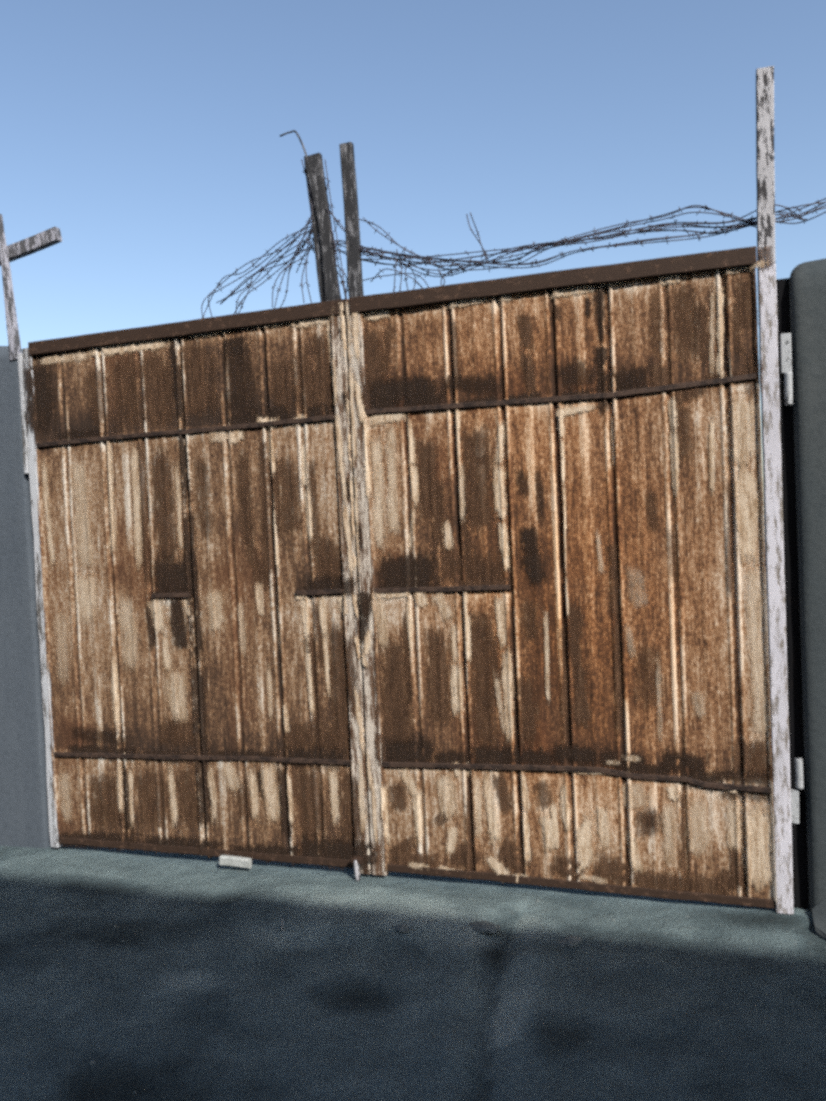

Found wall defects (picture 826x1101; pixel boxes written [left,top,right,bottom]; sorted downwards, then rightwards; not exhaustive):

corrosion [758,246,773,270]
corrosion [359,312,542,409]
corrosion [550,304,563,321]
corrosion [553,287,649,415]
corrosion [667,284,710,360]
corrosion [674,279,764,460]
corrosion [23,330,770,895]